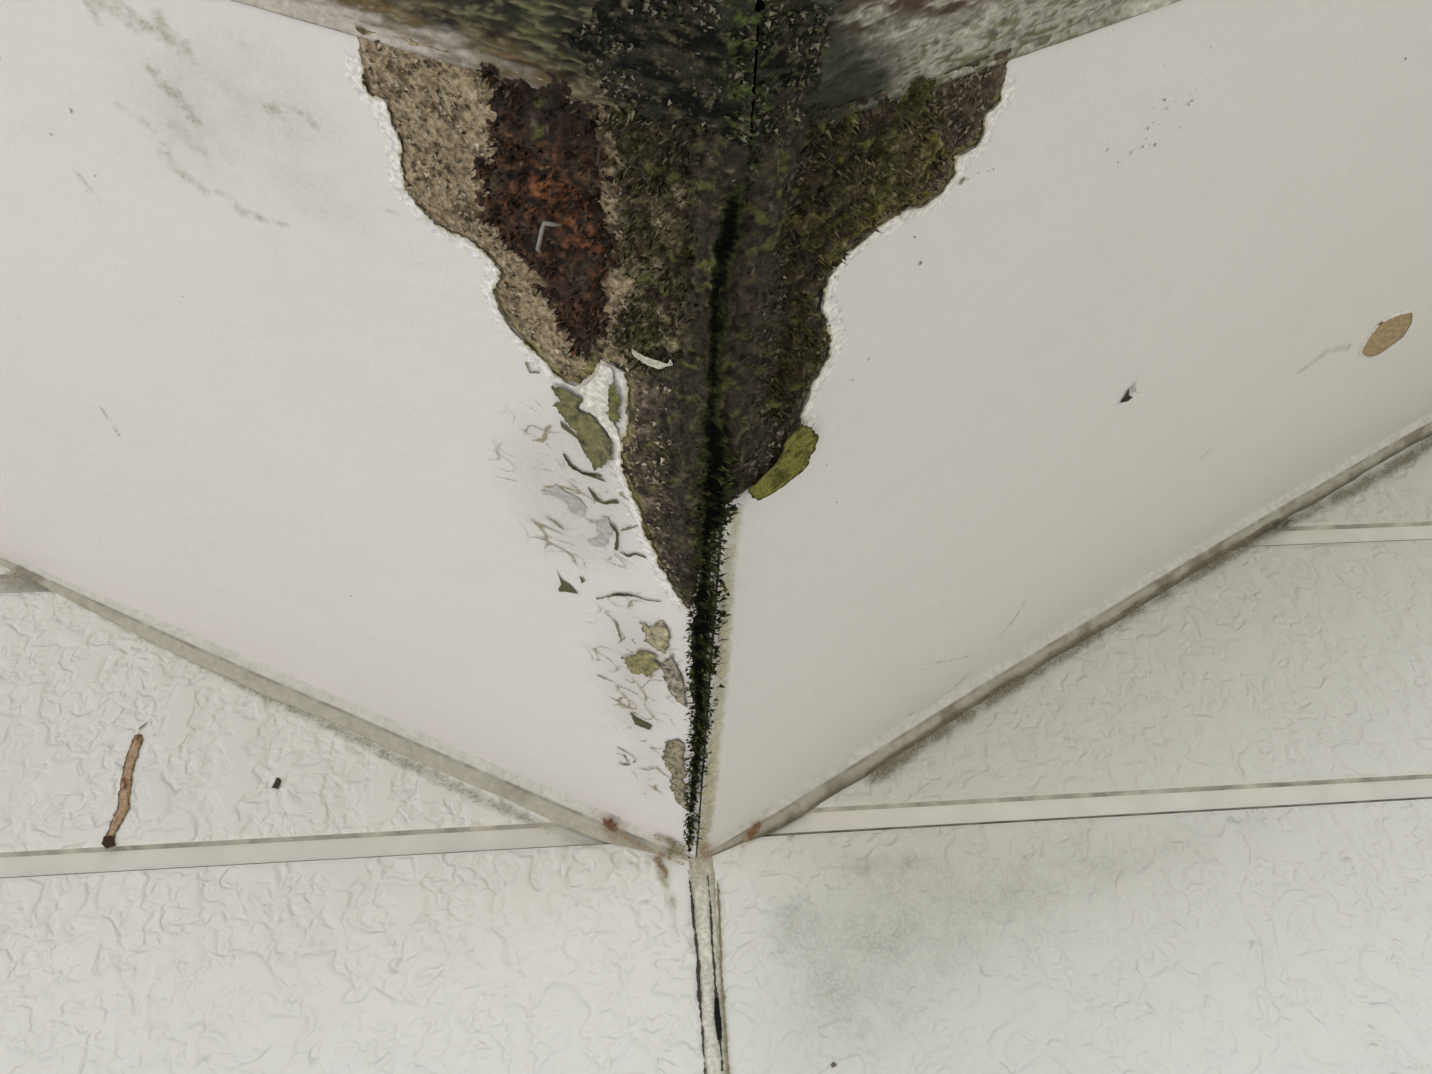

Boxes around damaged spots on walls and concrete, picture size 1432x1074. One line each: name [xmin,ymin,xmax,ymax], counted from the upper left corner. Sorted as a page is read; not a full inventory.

peeling [343,25,1018,730]
peeling [1358,308,1415,359]
peeling [615,738,688,811]
leakage [698,509,741,854]